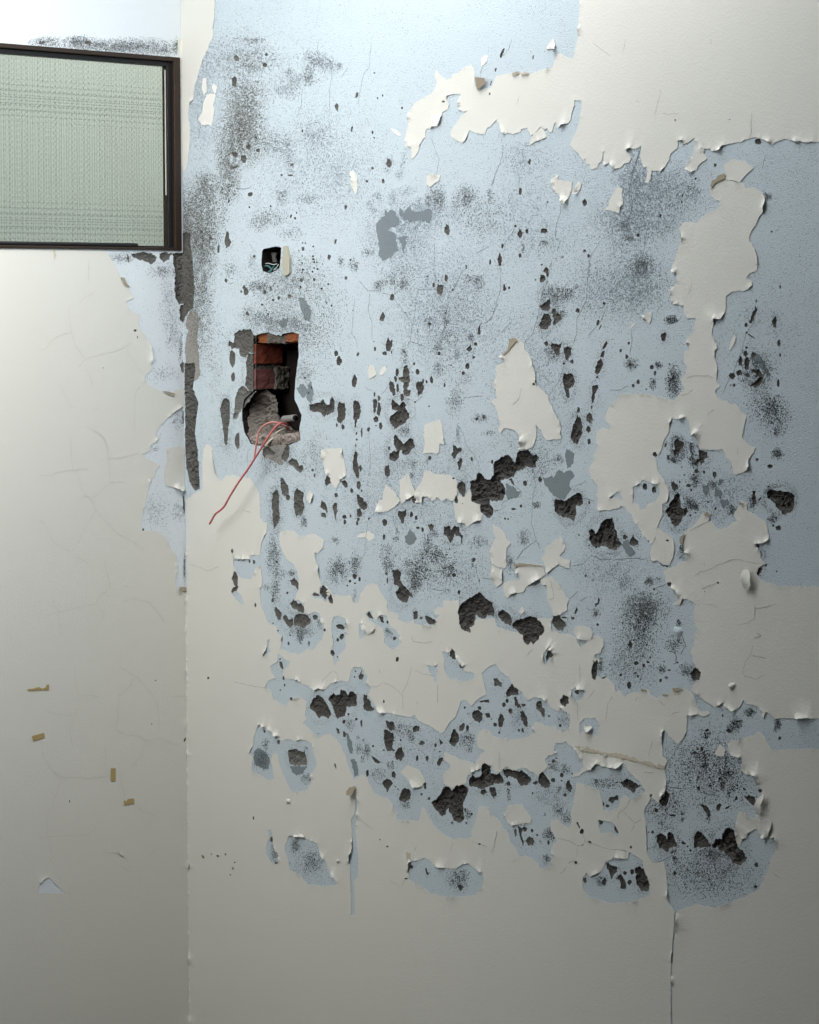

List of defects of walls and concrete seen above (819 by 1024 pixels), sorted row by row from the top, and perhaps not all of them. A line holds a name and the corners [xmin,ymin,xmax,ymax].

peeling [178,0,217,183]
peeling [391,0,819,183]
spalling [127,230,231,323]
spalling [220,329,315,478]
spalling [271,478,313,529]
peeling [309,392,383,541]
leakage [109,0,819,695]
peeling [375,337,561,555]
spalling [539,299,575,398]
spalling [554,493,590,521]
spalling [588,518,639,550]
leakage [306,674,773,908]